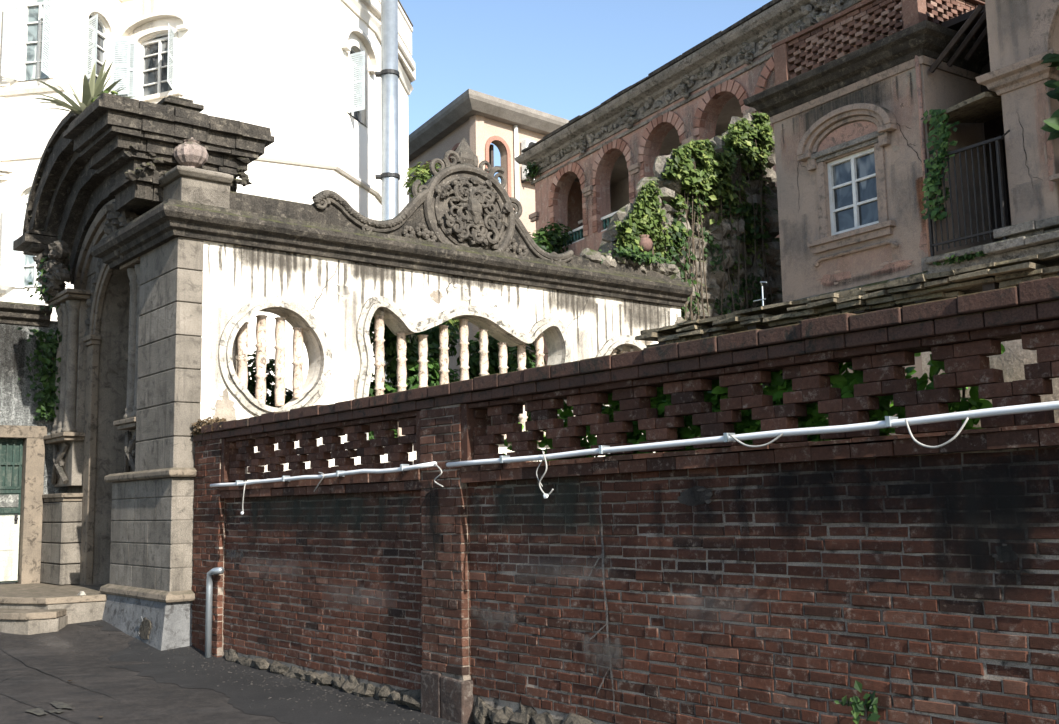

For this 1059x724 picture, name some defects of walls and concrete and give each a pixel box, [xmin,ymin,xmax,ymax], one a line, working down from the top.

water stain [208,244,529,312]
water stain [536,289,678,355]